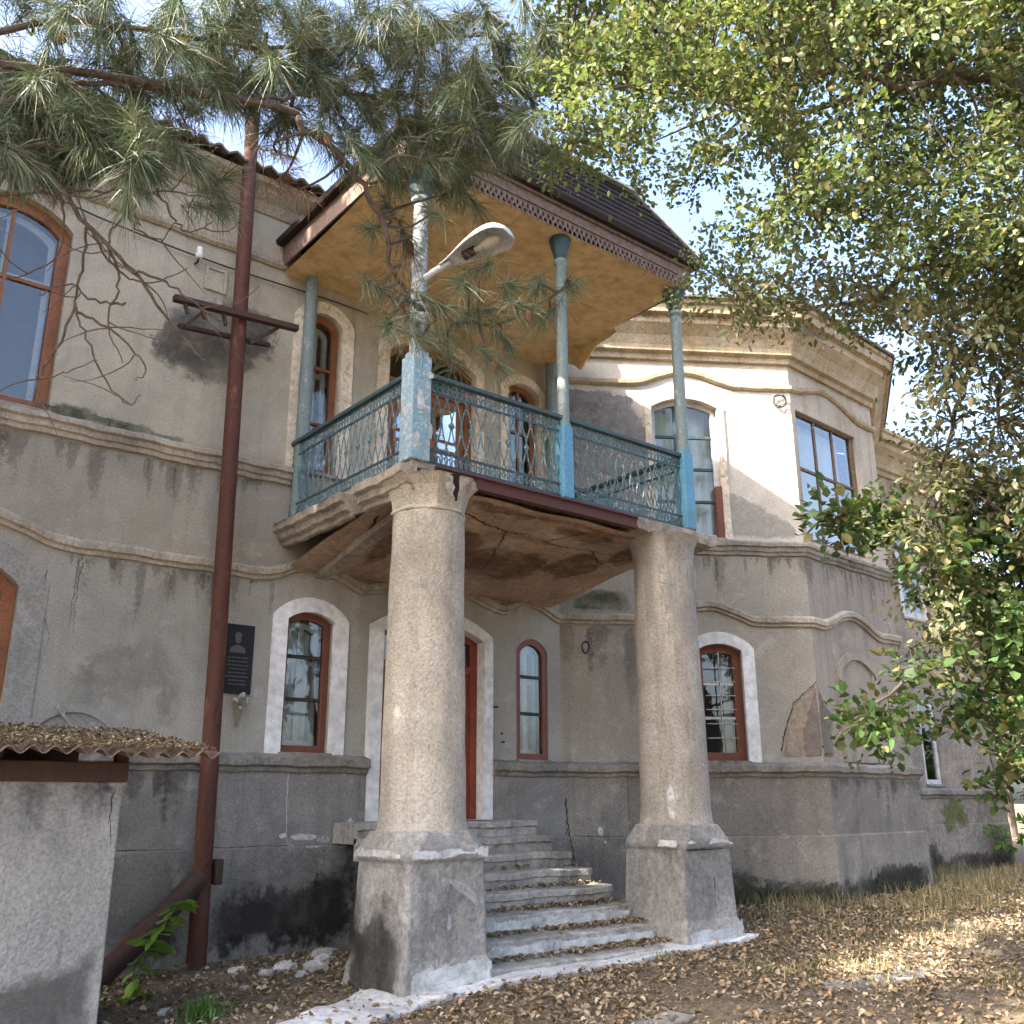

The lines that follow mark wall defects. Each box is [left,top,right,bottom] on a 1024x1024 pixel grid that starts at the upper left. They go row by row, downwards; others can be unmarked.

crack [465,512,623,581]
flaking render [781,682,835,757]
crack [565,798,627,863]
crack [687,835,785,851]
water stain [733,844,1014,907]
water stain [214,861,393,994]